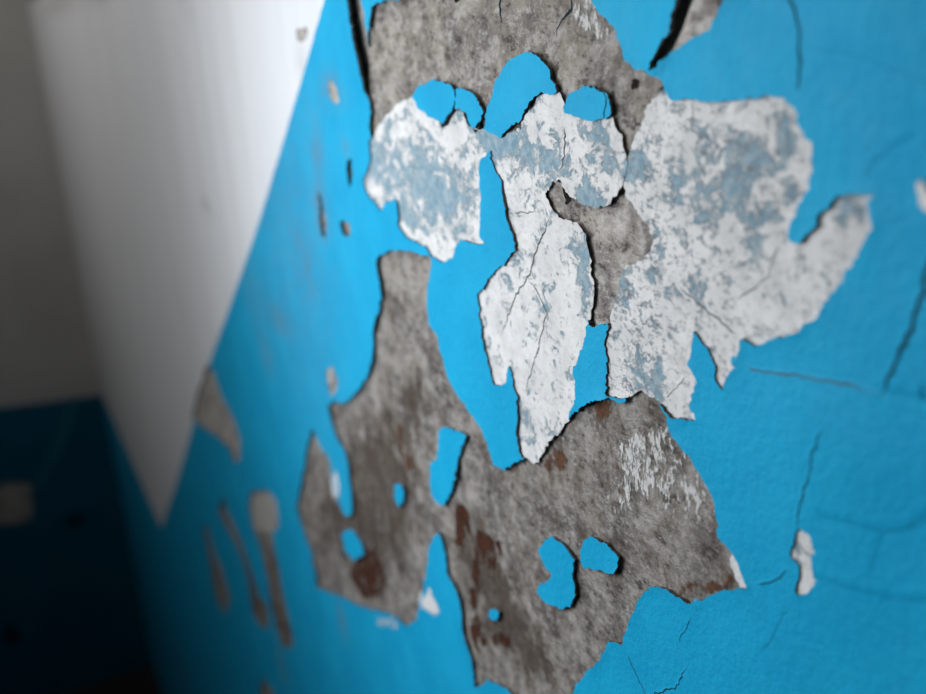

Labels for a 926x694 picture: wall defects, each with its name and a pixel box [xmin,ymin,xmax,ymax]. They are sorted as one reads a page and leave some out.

peeling [297,26,308,42]
crack [786,0,802,92]
spalling [299,0,873,694]
crack [731,255,926,414]
peeling [194,366,241,461]
crack [756,425,926,602]
peeling [205,525,230,611]
peeling [219,490,294,647]
crack [678,598,697,643]